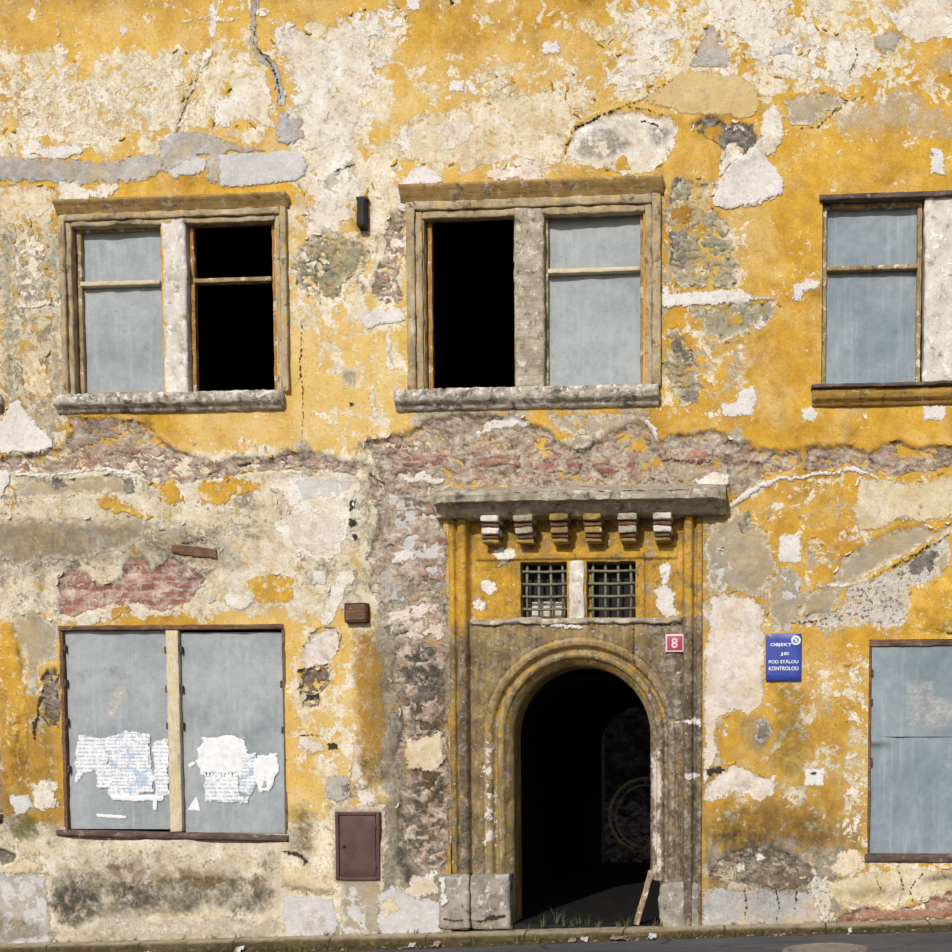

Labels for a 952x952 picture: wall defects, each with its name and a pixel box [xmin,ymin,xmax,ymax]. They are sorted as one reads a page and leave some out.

crack [247,0,287,120]
peeling [0,0,952,305]
spalling [688,300,781,344]
spalling [0,412,952,937]
water stain [58,888,95,915]